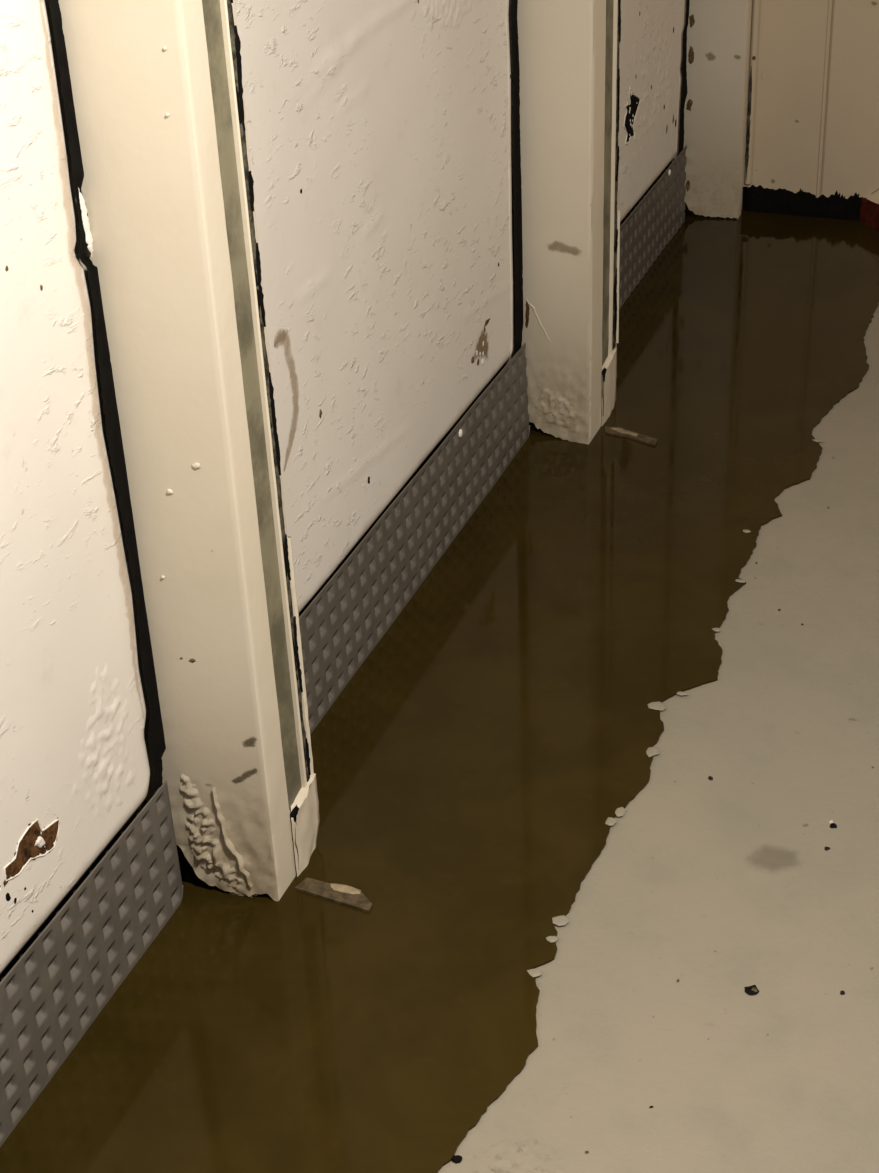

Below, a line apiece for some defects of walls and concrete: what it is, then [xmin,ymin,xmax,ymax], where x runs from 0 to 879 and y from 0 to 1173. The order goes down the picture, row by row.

peeling [612,0,641,350]
damp [274,332,298,471]
flaking render [471,318,491,365]
peeling [0,818,60,904]